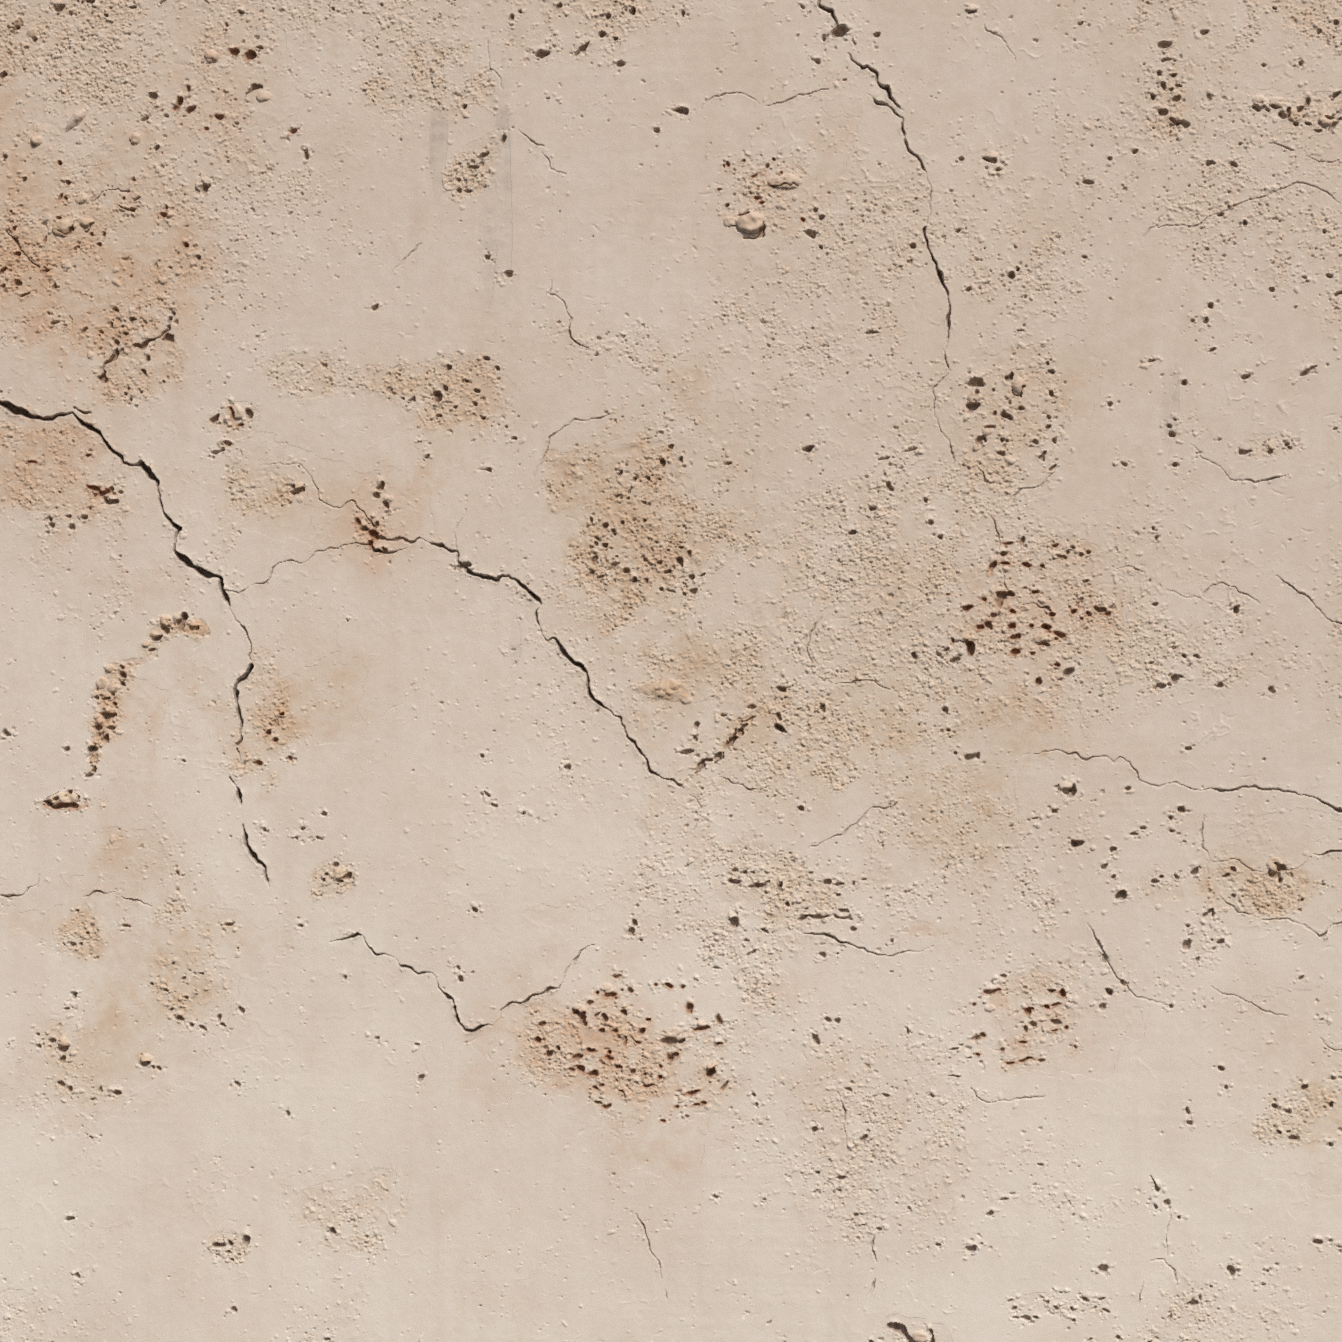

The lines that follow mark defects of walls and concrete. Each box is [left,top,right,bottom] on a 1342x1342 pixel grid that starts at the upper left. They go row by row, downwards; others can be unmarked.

crack [700,88,829,110]
crack [817,0,1059,593]
crack [0,401,762,889]
crack [1033,749,1342,873]
crack [1222,899,1342,938]
crack [329,932,595,1033]